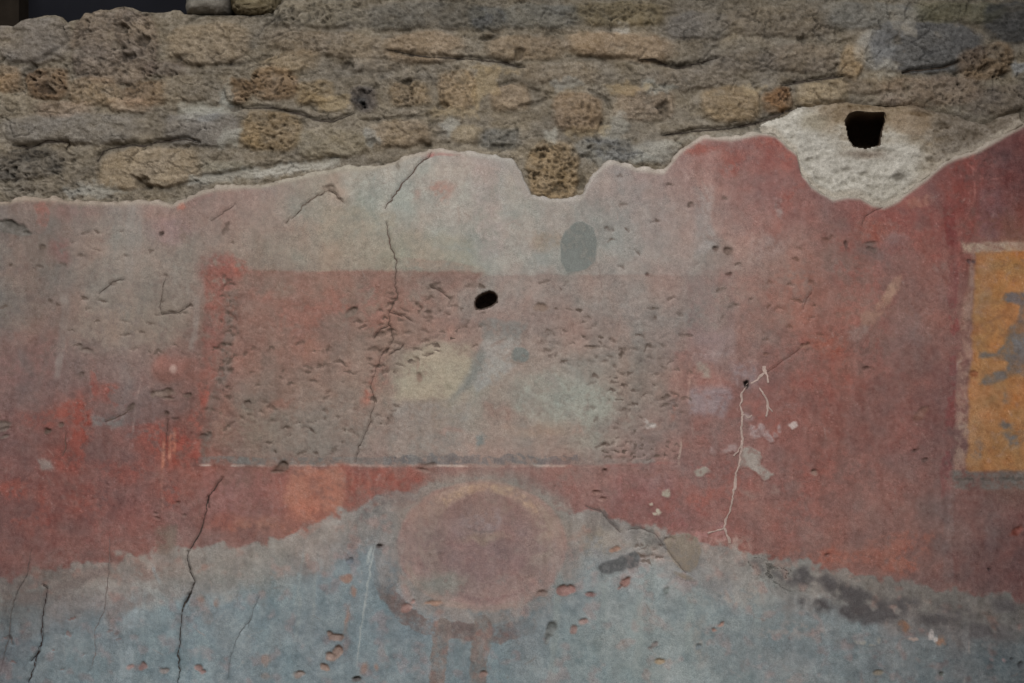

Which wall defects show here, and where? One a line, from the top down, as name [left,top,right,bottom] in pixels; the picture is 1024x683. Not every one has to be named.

spalling [759,102,1023,205]
crack [357,153,431,454]
damp [696,360,768,423]
crack [1,550,48,683]
crack [177,479,222,683]